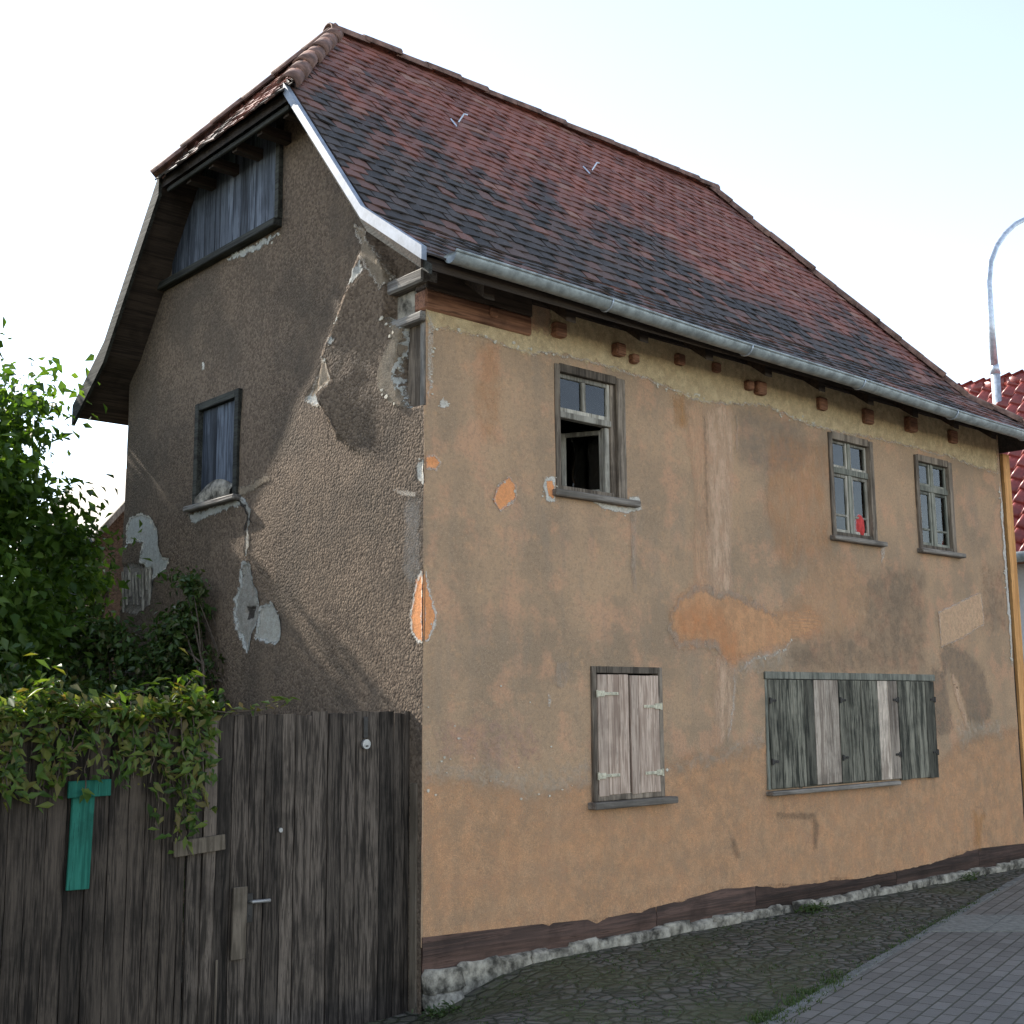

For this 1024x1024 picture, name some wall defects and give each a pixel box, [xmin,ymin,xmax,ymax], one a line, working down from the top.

spalling [349,225,396,289]
spalling [305,358,330,407]
spalling [377,316,413,408]
spalling [121,513,169,614]
crack [237,499,253,559]
spalling [492,476,517,510]
spalling [233,561,281,653]
spalling [410,571,437,643]